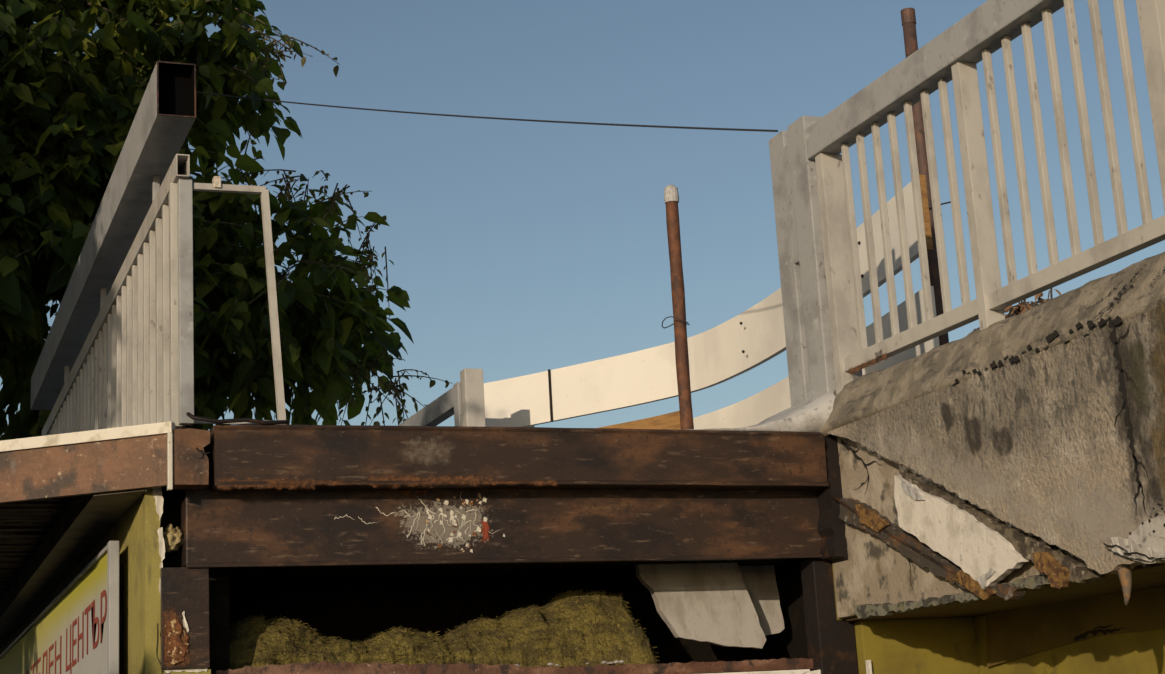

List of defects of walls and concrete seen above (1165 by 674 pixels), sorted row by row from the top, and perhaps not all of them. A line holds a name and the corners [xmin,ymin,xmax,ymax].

crack [1085,264,1165,519]
leakage [941,404,1012,454]
crack [841,441,879,495]
spalling [832,471,1106,619]
flaking render [1103,503,1165,562]
rust [163,608,190,667]